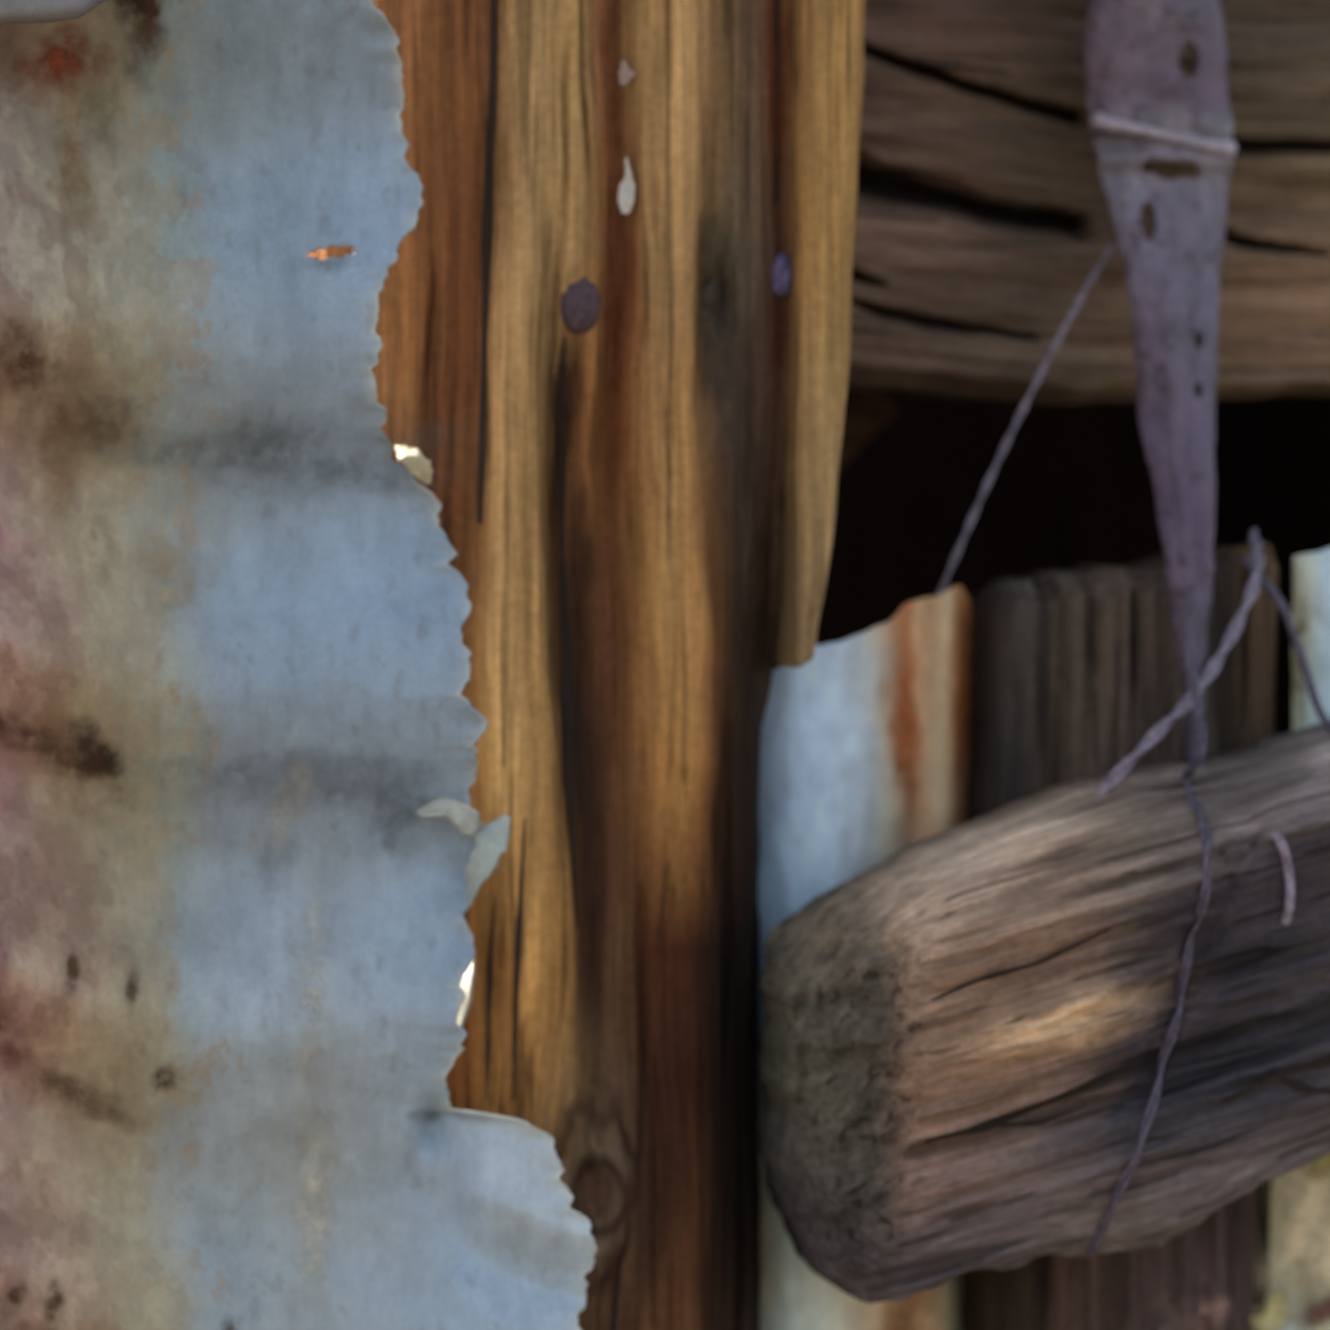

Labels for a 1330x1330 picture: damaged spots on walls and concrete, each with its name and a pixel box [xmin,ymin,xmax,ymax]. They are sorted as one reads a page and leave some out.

crack [864,46,1080,123]
crack [1232,139,1330,152]
crack [858,164,1083,234]
crack [1225,233,1324,255]
crack [852,271,1032,338]
rust [892,681,917,782]
rust [68,955,79,986]
rust [128,980,137,1001]
rust [48,1292,63,1318]